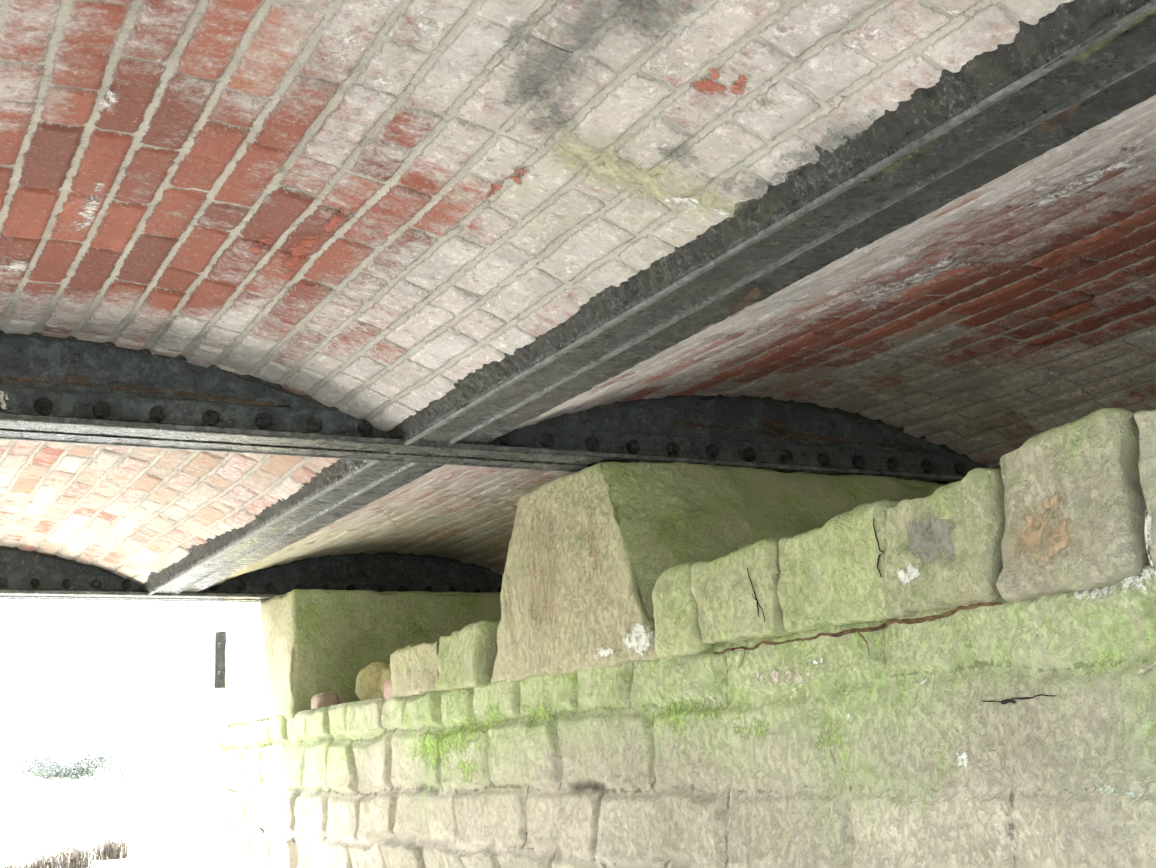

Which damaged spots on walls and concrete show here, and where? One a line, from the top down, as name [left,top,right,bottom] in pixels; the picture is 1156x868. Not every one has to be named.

spalling [690,68,747,95]
water stain [502,74,875,217]
corrosion [1010,494,1069,561]
crack [714,568,1003,668]
crack [982,694,1056,705]